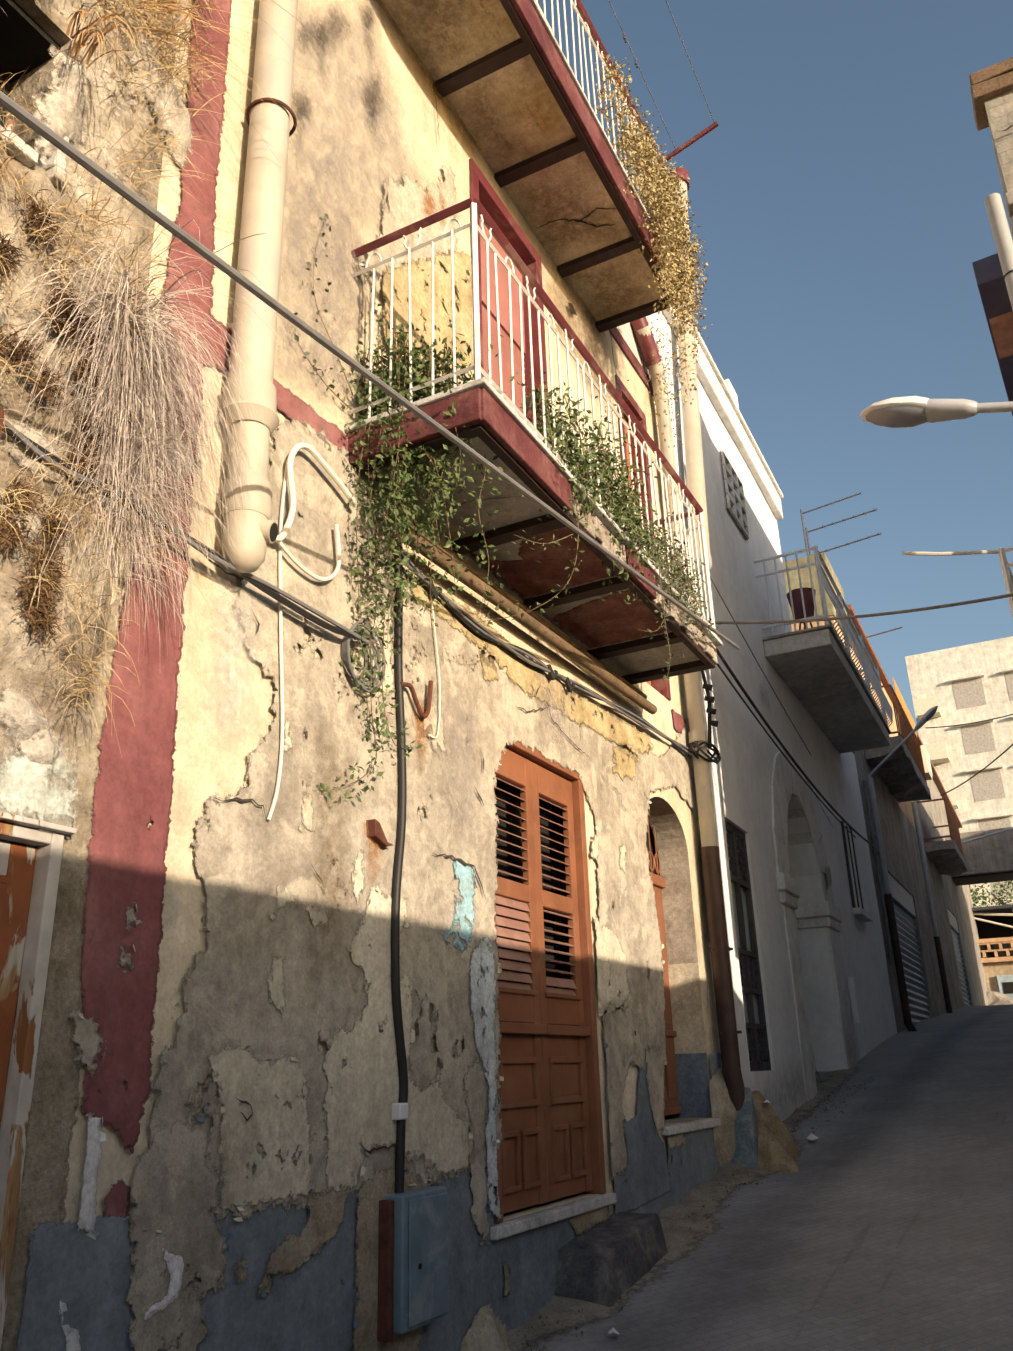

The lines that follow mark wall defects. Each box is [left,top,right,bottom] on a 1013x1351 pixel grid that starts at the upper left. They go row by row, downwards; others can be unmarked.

crack [538,208,617,228]
spalling [652,584,718,665]
flaking render [0,684,63,765]
peeling [121,417,699,1351]
peeling [700,841,710,943]
spalling [117,900,143,974]
spalling [68,1009,106,1078]
peeling [77,1112,106,1240]
peeling [59,1300,81,1351]